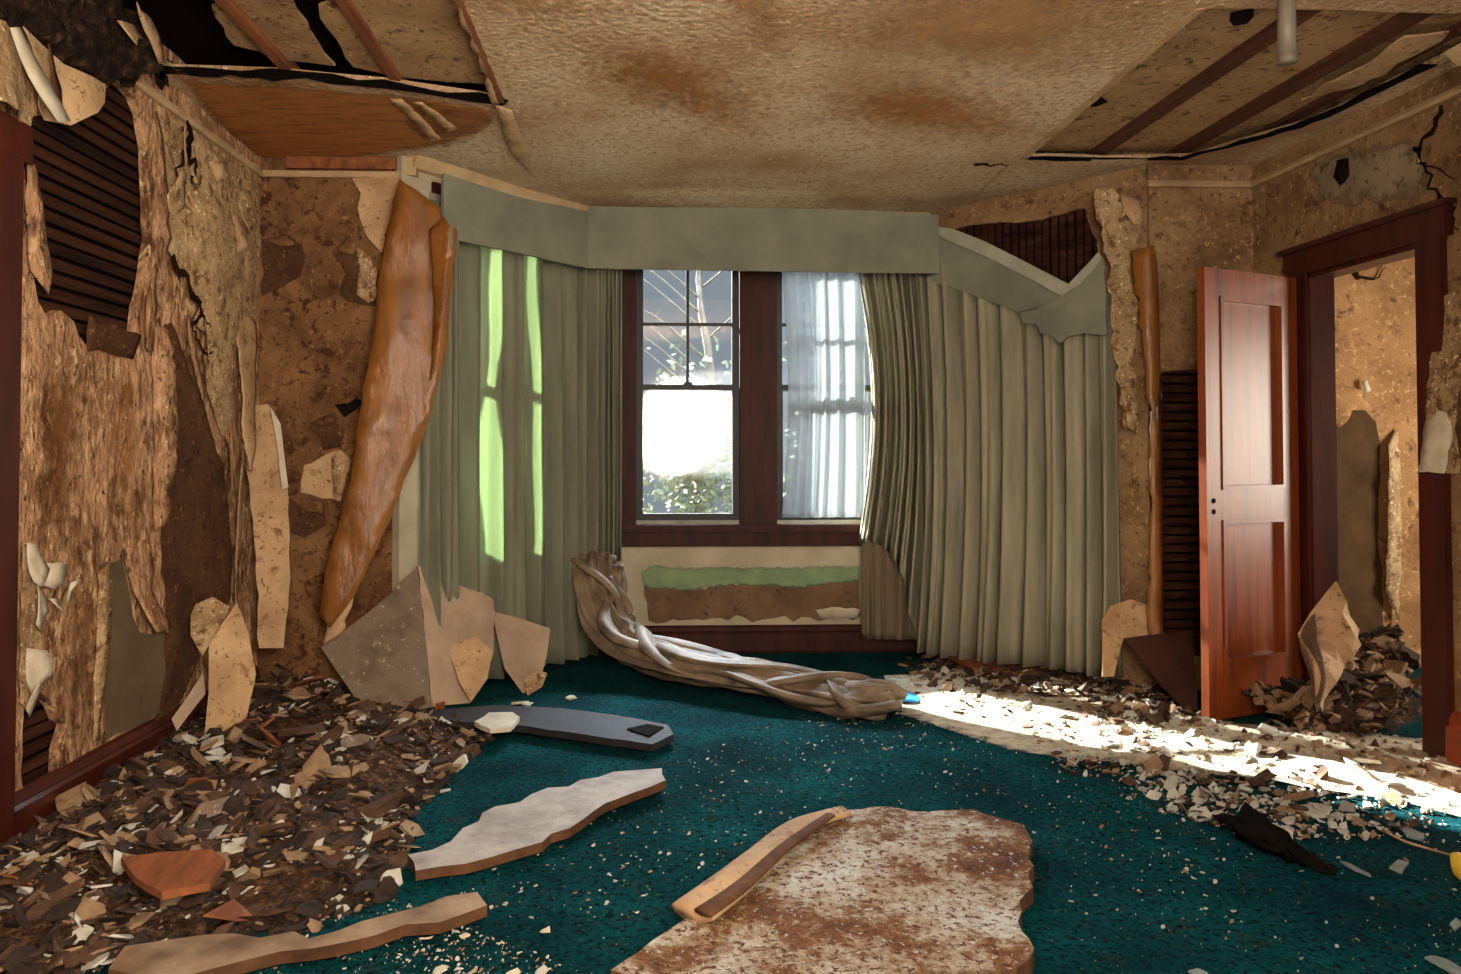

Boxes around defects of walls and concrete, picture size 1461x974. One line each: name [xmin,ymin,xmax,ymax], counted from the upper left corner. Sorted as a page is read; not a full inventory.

peeling [176,69,534,176]
leakage [598,40,749,122]
leakage [837,85,1009,134]
spalling [1310,142,1427,207]
peeling [24,163,53,294]
peeling [86,263,158,359]
crack [170,254,213,355]
peeling [1094,188,1144,433]
peeling [270,407,288,490]
flaking render [1336,379,1402,634]
flaking render [18,538,172,741]